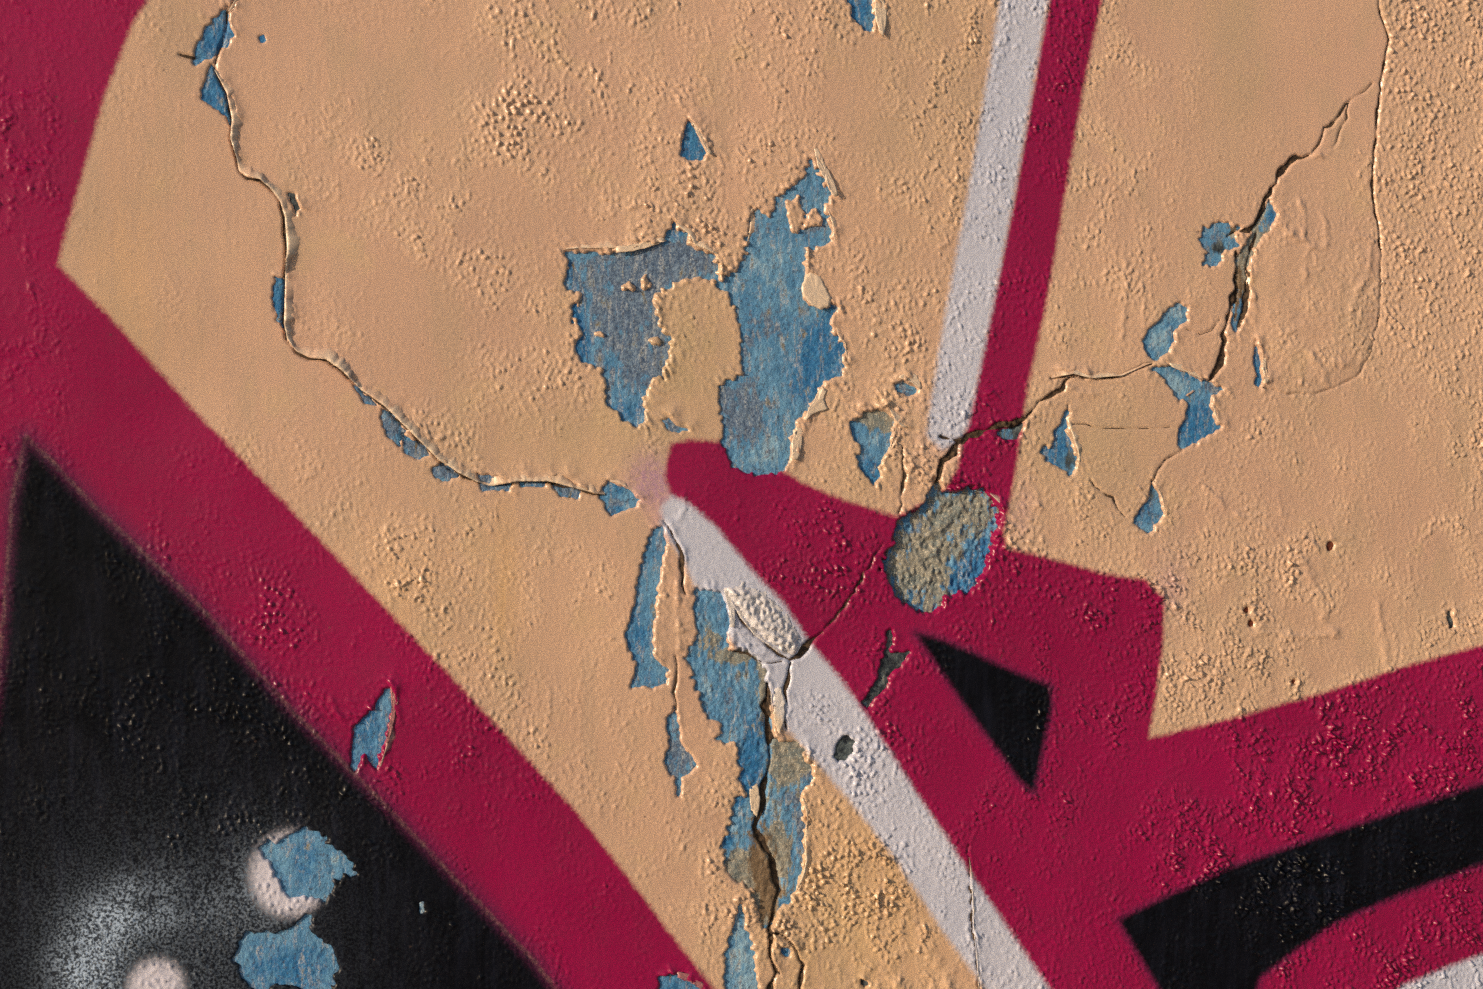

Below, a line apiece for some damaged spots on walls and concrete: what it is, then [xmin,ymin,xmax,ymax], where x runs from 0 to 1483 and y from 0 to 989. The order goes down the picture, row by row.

crack [180,0,605,500]
peeling [564,148,848,476]
peeling [850,409,907,485]
crack [898,362,1152,517]
crack [1086,424,1174,482]
peeling [1143,303,1223,449]
crack [1189,6,1390,394]
peeling [625,527,669,688]
spalling [882,482,1003,612]
peeling [683,587,813,989]
crack [731,552,877,989]
peeling [232,826,357,989]